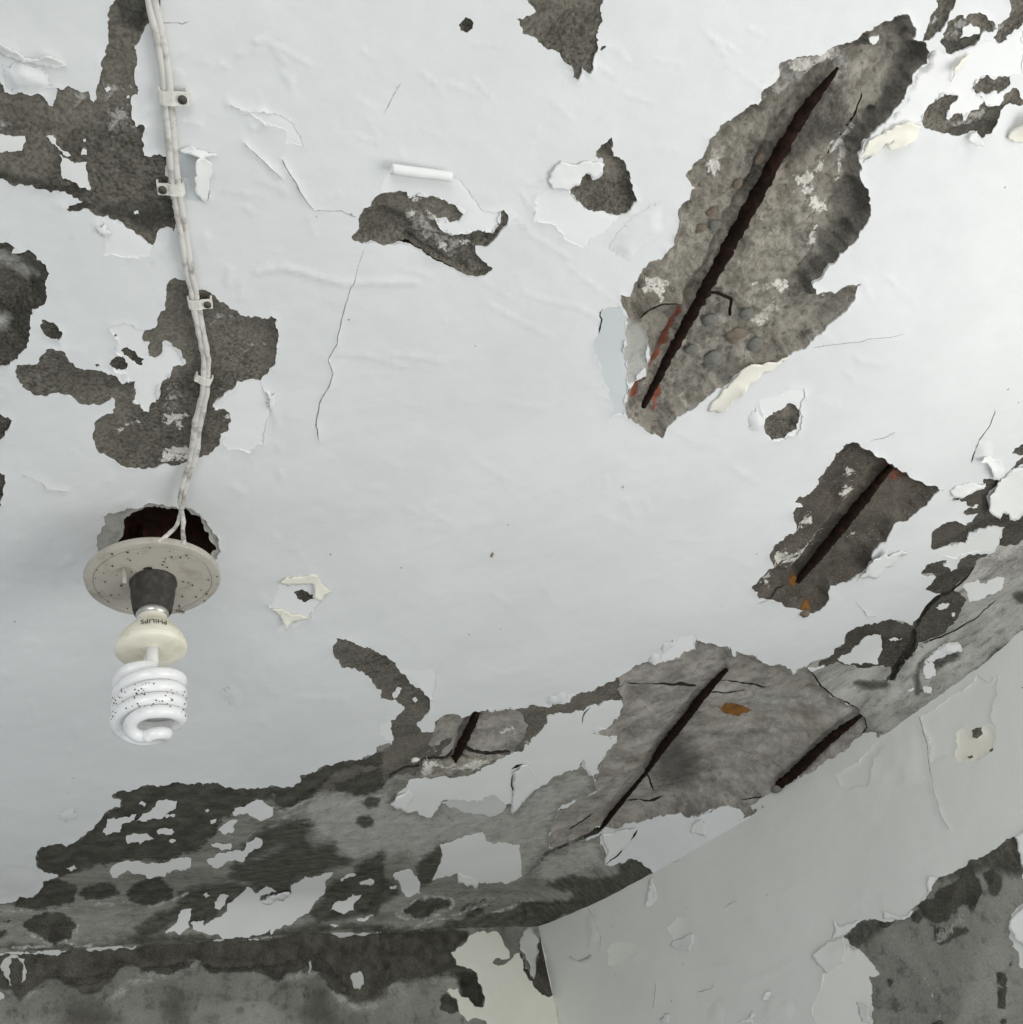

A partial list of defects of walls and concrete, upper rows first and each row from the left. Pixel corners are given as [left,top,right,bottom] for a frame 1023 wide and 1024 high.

peeling [0,0,176,245]
spalling [352,190,508,276]
peeling [518,0,605,80]
spalling [570,137,637,215]
spalling [620,0,1023,440]
peeling [0,242,279,469]
crack [315,250,364,439]
rust [630,303,683,396]
spalling [752,442,939,613]
peeling [0,479,1023,1024]
rust [719,703,751,716]
damp [0,748,652,1019]